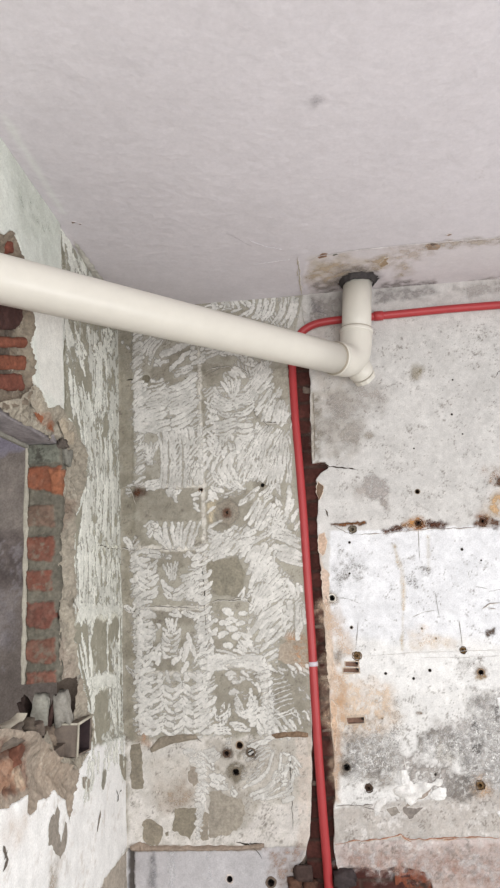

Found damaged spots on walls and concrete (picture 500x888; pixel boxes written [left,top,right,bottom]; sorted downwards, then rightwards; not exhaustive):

flaking render [0,231,25,259]
flaking render [0,305,95,741]
corrosion [383,519,447,534]
flaking render [42,731,90,798]
peeling [48,803,67,859]
crack [336,817,498,845]
peeling [101,849,127,888]